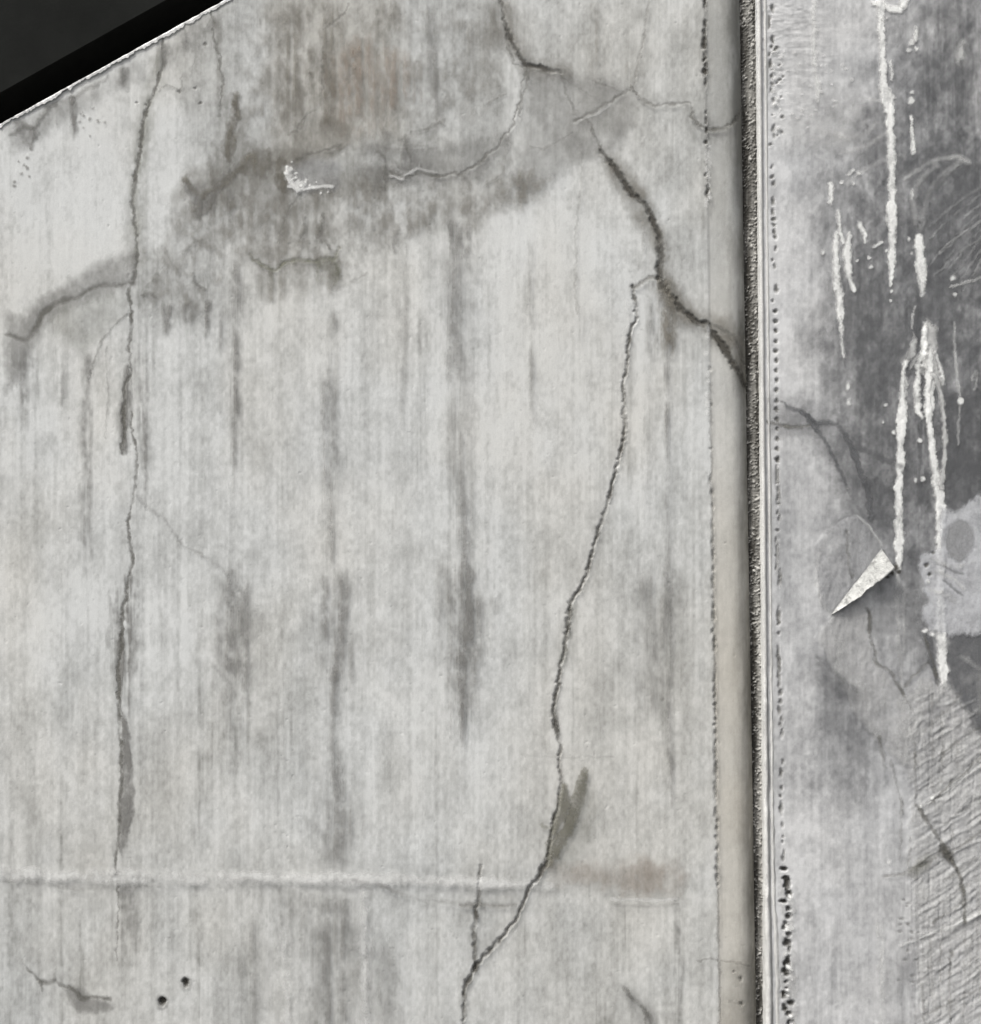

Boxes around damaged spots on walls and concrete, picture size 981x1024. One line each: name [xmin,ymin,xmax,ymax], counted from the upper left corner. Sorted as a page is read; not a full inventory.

crack [131,69,201,226]
spalling [284,161,333,194]
water stain [822,0,927,358]
crack [120,253,147,462]
crack [552,153,746,825]
water stain [883,322,981,574]
crack [115,512,135,877]
water stain [323,578,348,713]
water stain [447,555,481,726]
peeling [831,549,901,615]
water stain [542,768,588,867]
crack [462,862,547,1021]